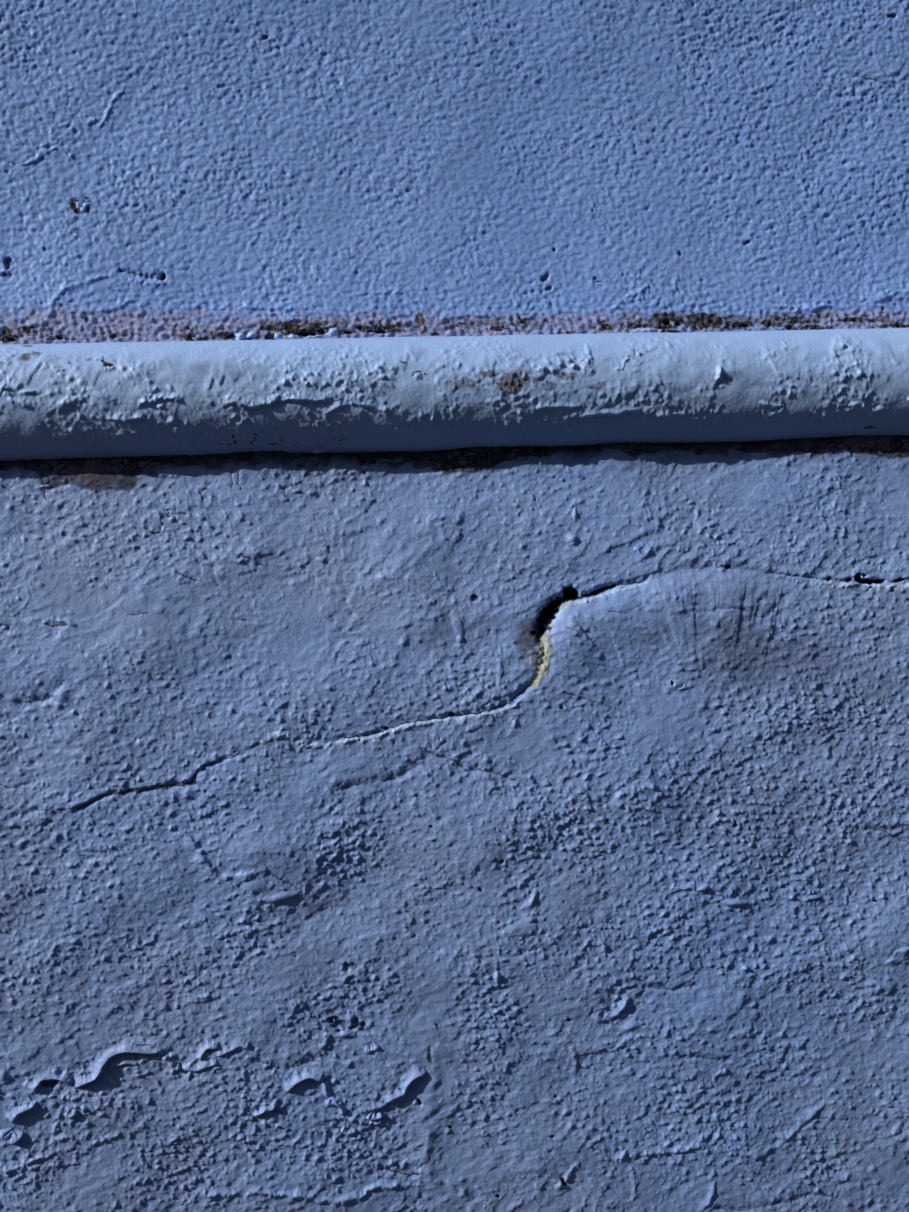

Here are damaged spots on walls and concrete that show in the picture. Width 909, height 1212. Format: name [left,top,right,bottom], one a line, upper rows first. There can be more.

crack [535,565,909,643]
crack [329,684,532,791]